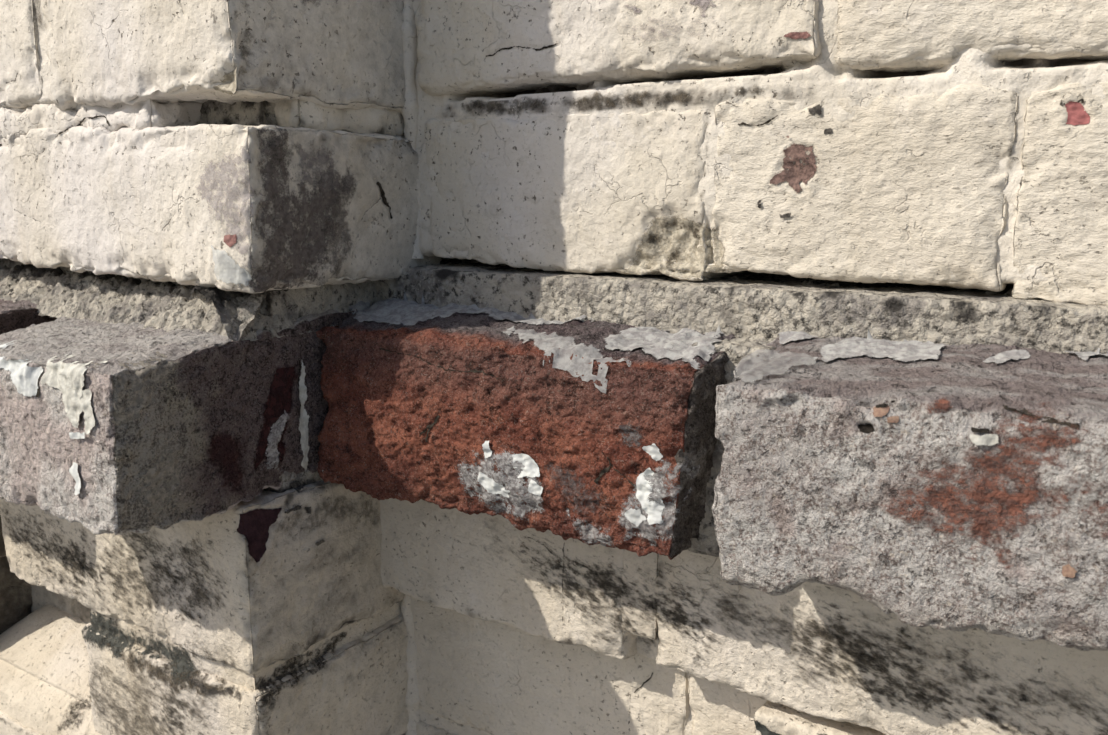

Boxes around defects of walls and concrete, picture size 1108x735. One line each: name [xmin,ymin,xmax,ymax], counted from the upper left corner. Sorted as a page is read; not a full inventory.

crack [486,43,559,57]
crack [36,115,110,162]
crack [364,182,393,219]
peeling [0,340,180,439]
peeling [348,292,723,394]
peeling [732,329,945,382]
peeling [458,441,544,525]
peeling [615,443,701,545]
damp [5,510,225,626]
damp [60,649,238,735]
damp [256,632,347,708]
damp [787,605,973,726]